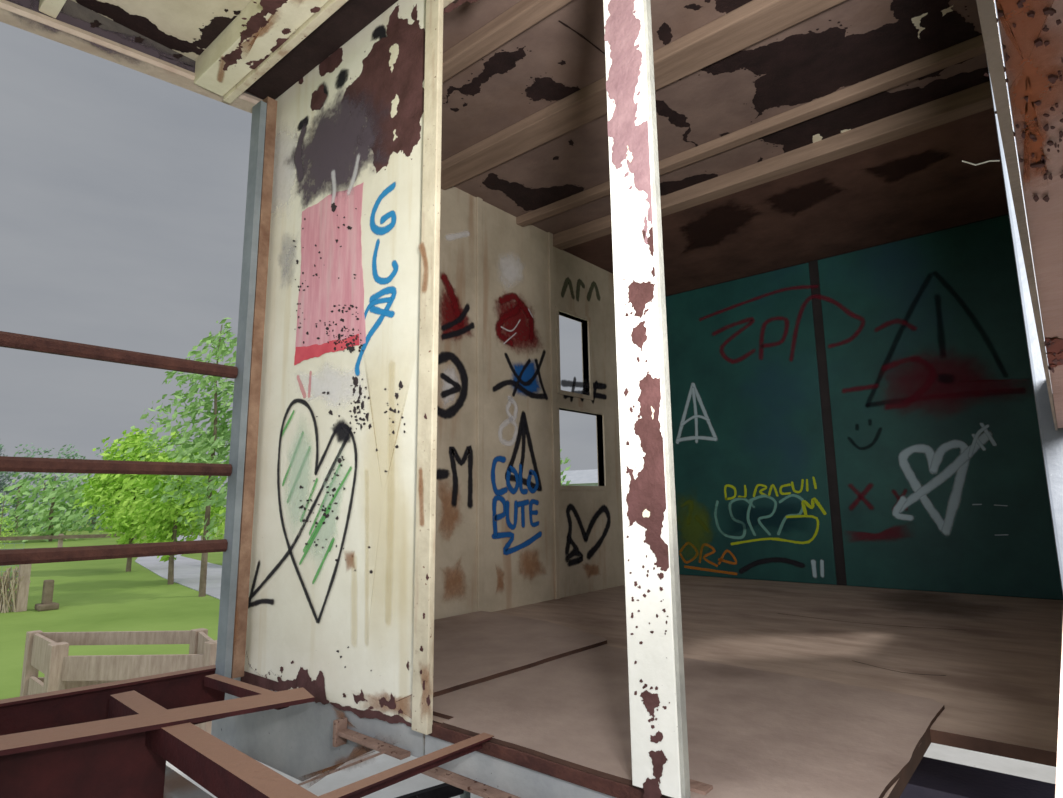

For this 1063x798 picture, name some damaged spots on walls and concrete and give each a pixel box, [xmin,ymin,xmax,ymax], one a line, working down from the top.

peeling [76,0,291,71]
peeling [310,48,343,111]
peeling [342,4,425,173]
peeling [442,46,531,112]
peeling [698,0,982,122]
peeling [758,57,990,153]
rust [996,0,1062,176]
peeling [482,173,584,211]
peeling [559,0,718,644]
peeling [316,376,372,434]
peeling [240,656,412,727]
peeling [634,679,670,798]